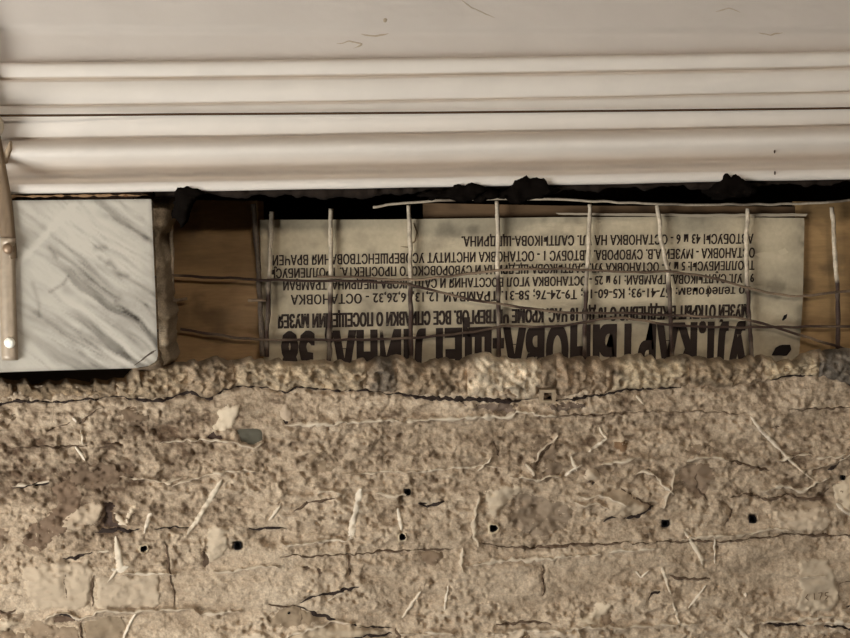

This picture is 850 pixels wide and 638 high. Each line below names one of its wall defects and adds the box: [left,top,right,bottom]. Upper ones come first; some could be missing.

spalling [416,175,560,204]
spalling [171,186,204,228]
spalling [133,351,166,371]
crack [0,386,534,450]
crack [556,387,747,418]
crack [789,404,850,412]
crack [483,456,850,596]
crack [648,575,710,600]
spalling [268,604,327,628]
crack [496,620,560,638]
crack [767,605,850,631]